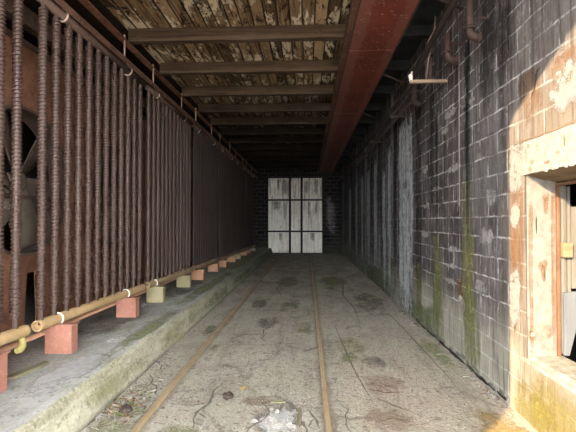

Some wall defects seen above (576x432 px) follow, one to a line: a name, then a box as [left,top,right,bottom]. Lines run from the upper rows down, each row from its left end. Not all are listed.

peeling [549,51,576,112]
leakage [349,92,448,315]
leakage [435,47,486,365]
efflorescence [481,229,493,245]
crack [328,280,467,403]
crack [188,384,223,427]